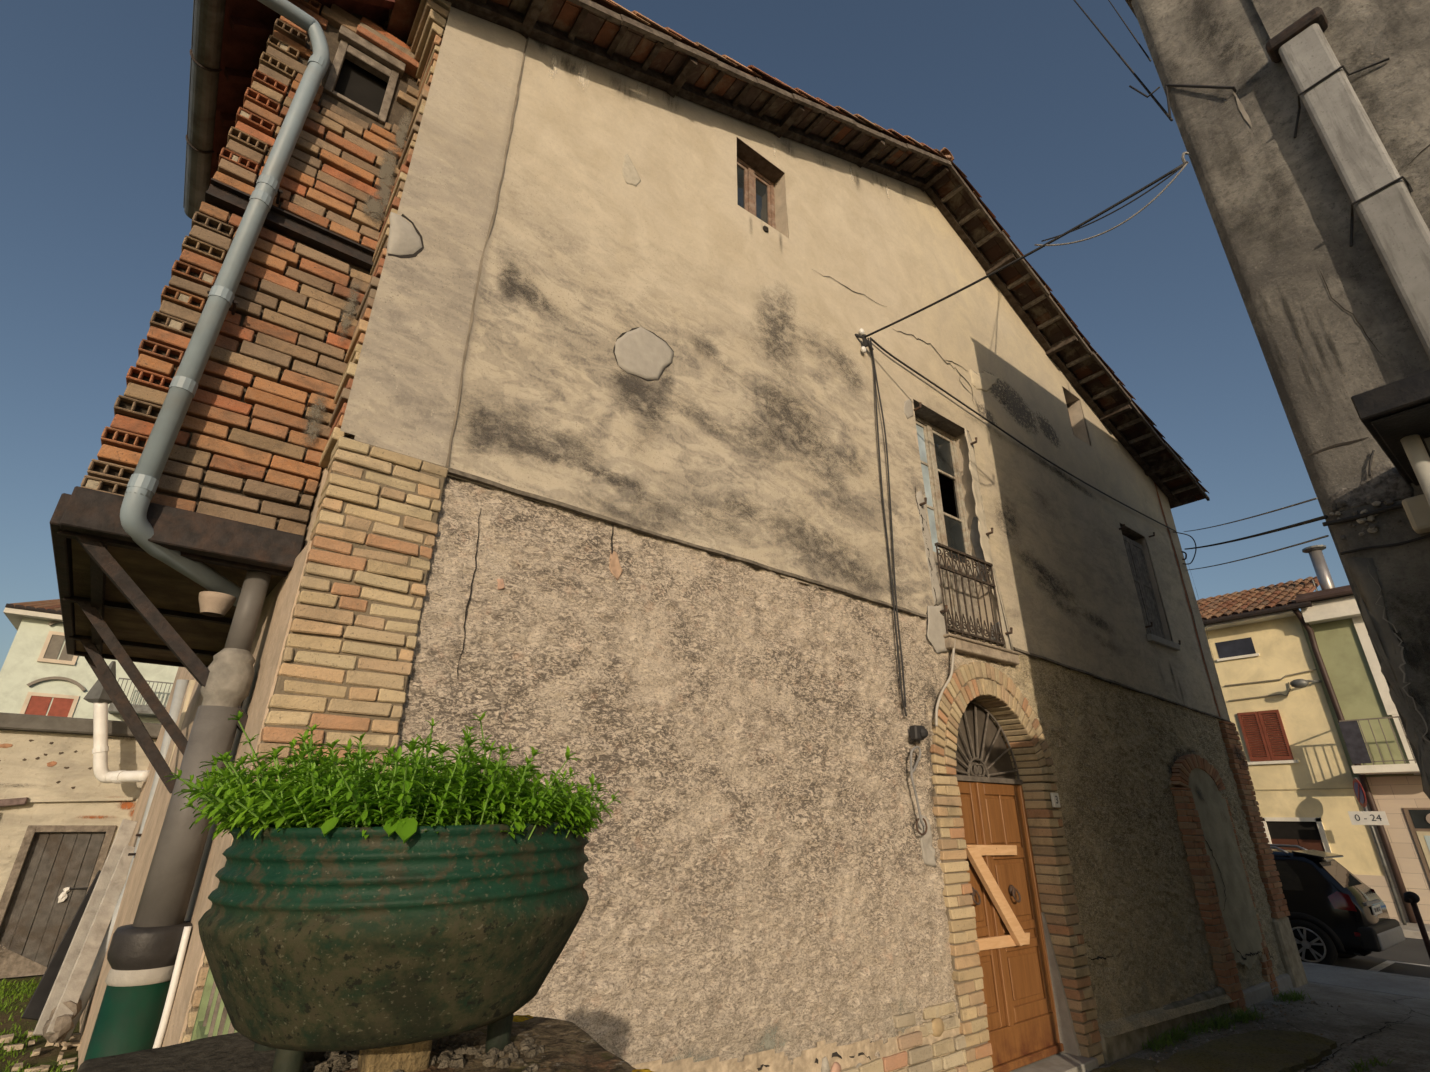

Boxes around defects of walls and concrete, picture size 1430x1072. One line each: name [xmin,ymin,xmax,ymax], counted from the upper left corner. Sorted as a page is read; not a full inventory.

leakage [506,271,544,304]
leakage [763,304,792,355]
crack [812,269,974,403]
crack [1316,264,1378,350]
leakage [471,408,640,488]
leakage [619,375,671,420]
leakage [748,393,829,461]
spalling [1327,464,1414,540]
crack [457,511,481,677]
peeling [1346,557,1430,799]